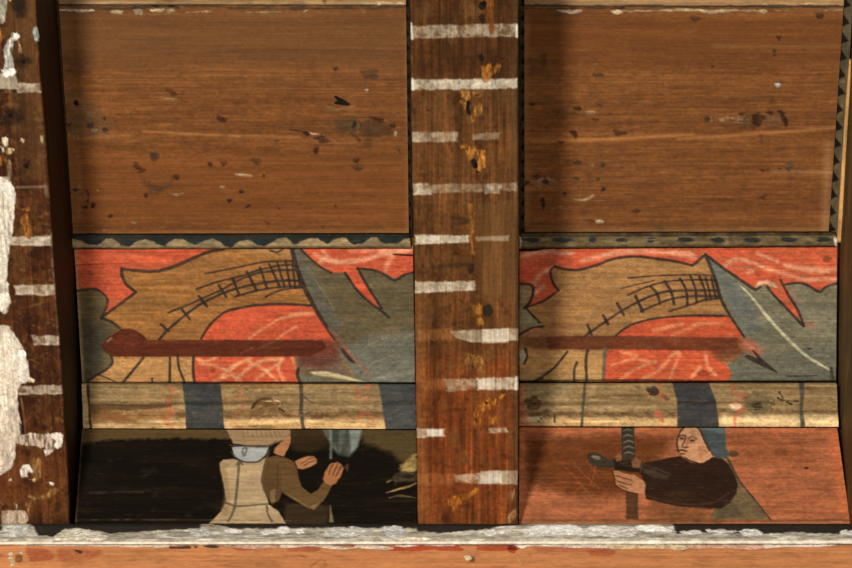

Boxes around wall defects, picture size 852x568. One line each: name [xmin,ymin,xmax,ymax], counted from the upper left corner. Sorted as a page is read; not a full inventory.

peeling [0,182,14,206]
peeling [0,235,8,283]
peeling [0,293,10,312]
peeling [0,333,35,412]
peeling [44,433,63,455]
peeling [3,515,454,554]
peeling [483,528,512,536]
peeling [515,525,834,551]